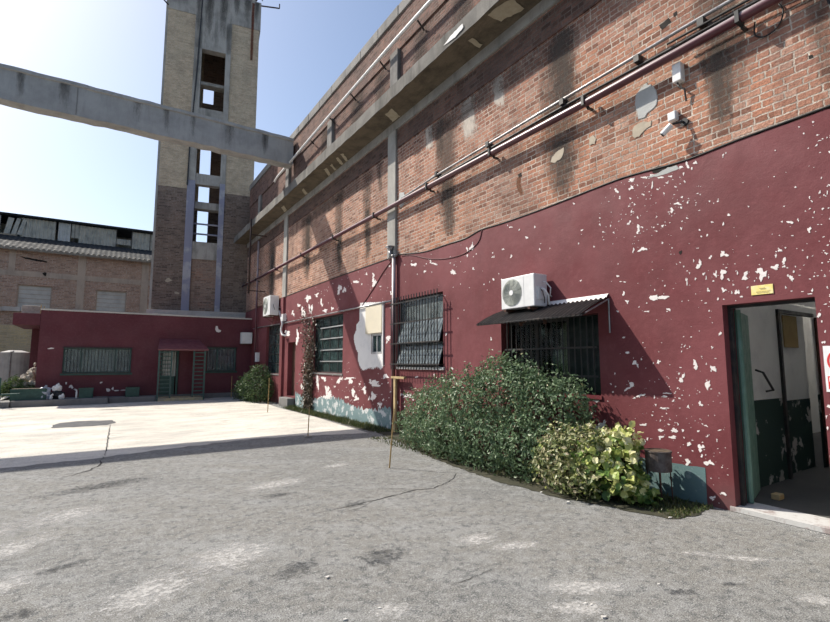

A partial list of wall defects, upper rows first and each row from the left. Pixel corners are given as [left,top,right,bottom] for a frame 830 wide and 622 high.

peeling [286,287,339,319]
leakage [426,68,517,224]
leakage [525,31,570,187]
peeling [599,161,701,253]
peeling [676,177,830,344]
peeling [316,362,414,410]